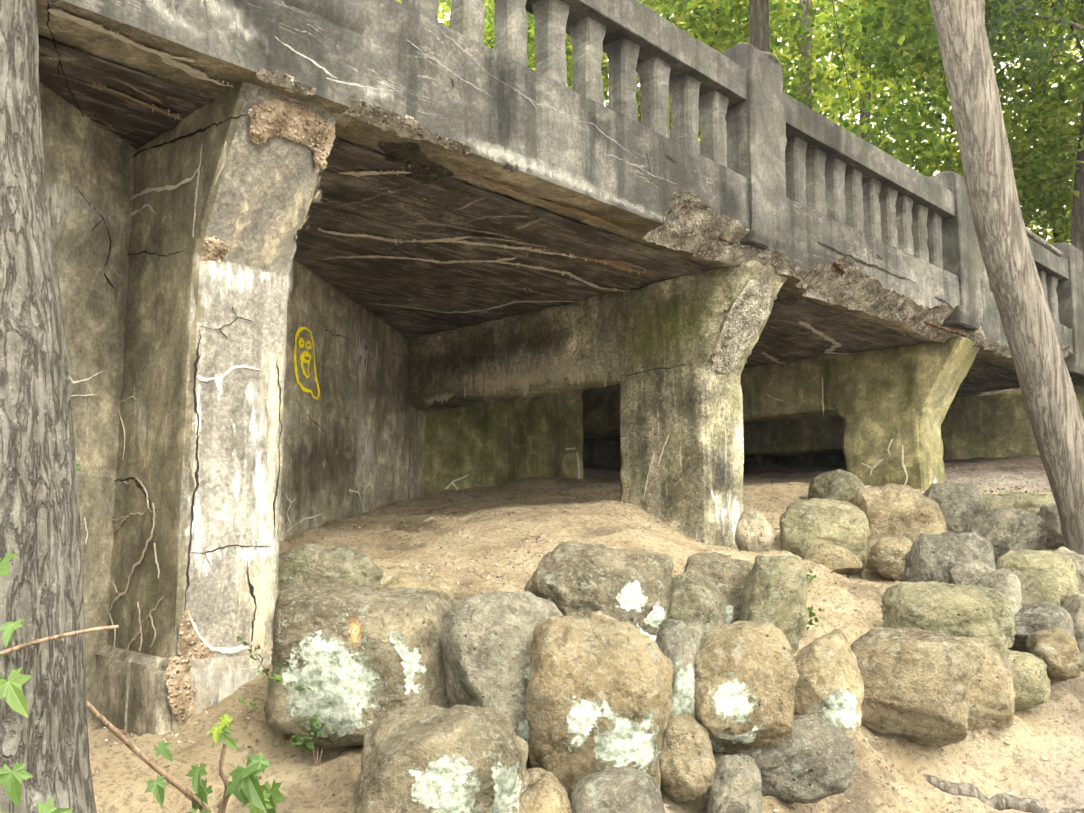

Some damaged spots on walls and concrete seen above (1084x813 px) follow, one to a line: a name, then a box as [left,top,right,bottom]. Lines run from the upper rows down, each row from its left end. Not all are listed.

crack [47,1,84,117]
spalling [248,68,472,184]
spalling [200,235,229,264]
spalling [641,190,1014,375]
crack [115,477,152,530]
crack [183,306,326,653]
damp [711,466,742,546]
spalling [165,610,215,728]